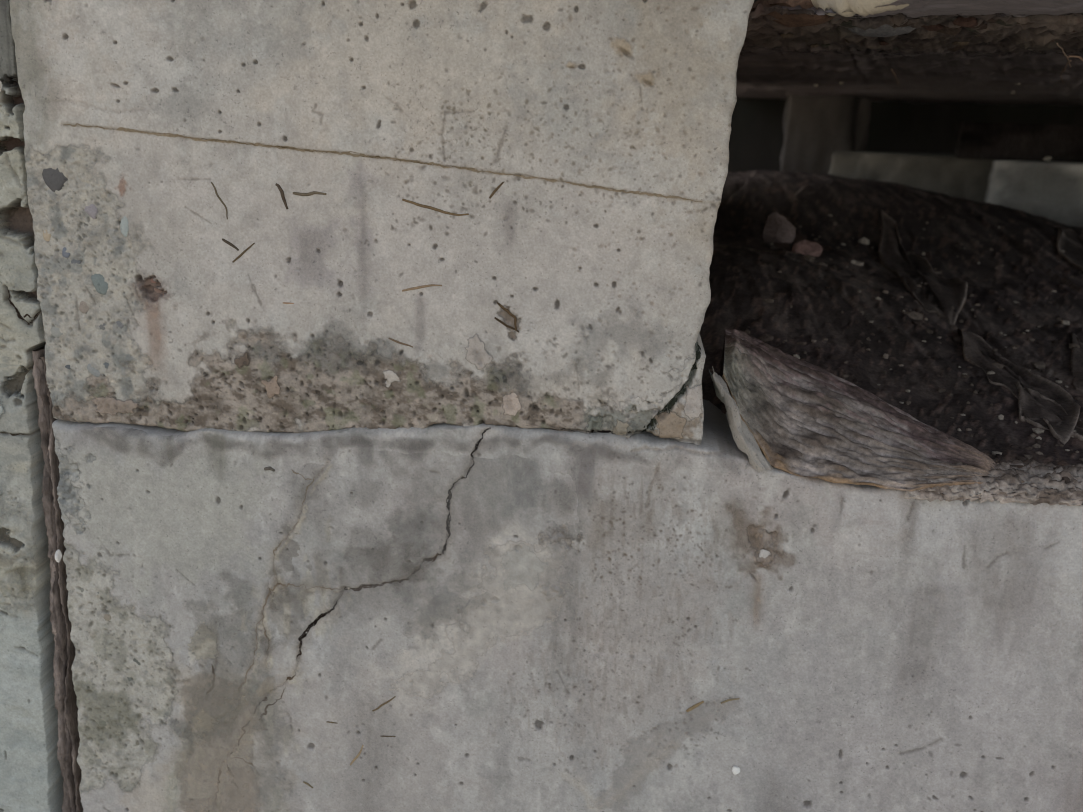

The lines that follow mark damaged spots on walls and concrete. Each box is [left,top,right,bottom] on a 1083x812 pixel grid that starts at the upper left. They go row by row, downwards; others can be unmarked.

spalling [0,77,24,107]
spalling [0,137,706,445]
spalling [0,528,25,552]
spalling [55,438,179,792]
crack [202,426,528,799]